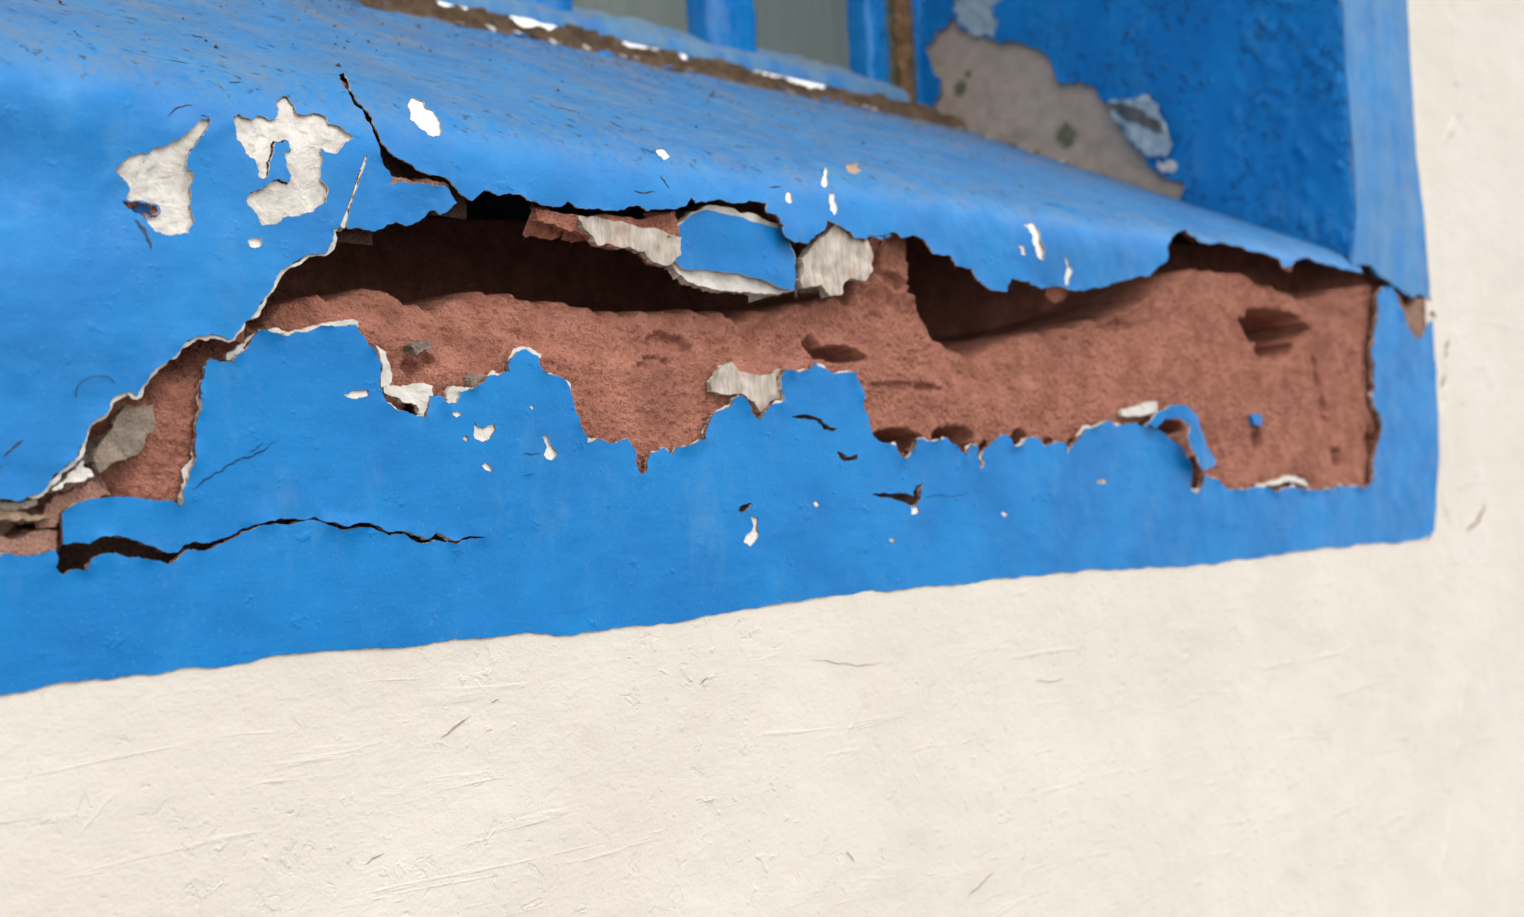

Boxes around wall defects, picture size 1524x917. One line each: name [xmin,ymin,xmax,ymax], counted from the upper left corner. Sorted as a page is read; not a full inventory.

peeling [114,119,209,249]
peeling [233,96,351,248]
crack [336,78,467,245]
peeling [408,98,441,137]
peeling [845,163,861,174]
peeling [928,0,1185,200]
flaking render [0,168,1408,556]
crack [17,518,480,573]